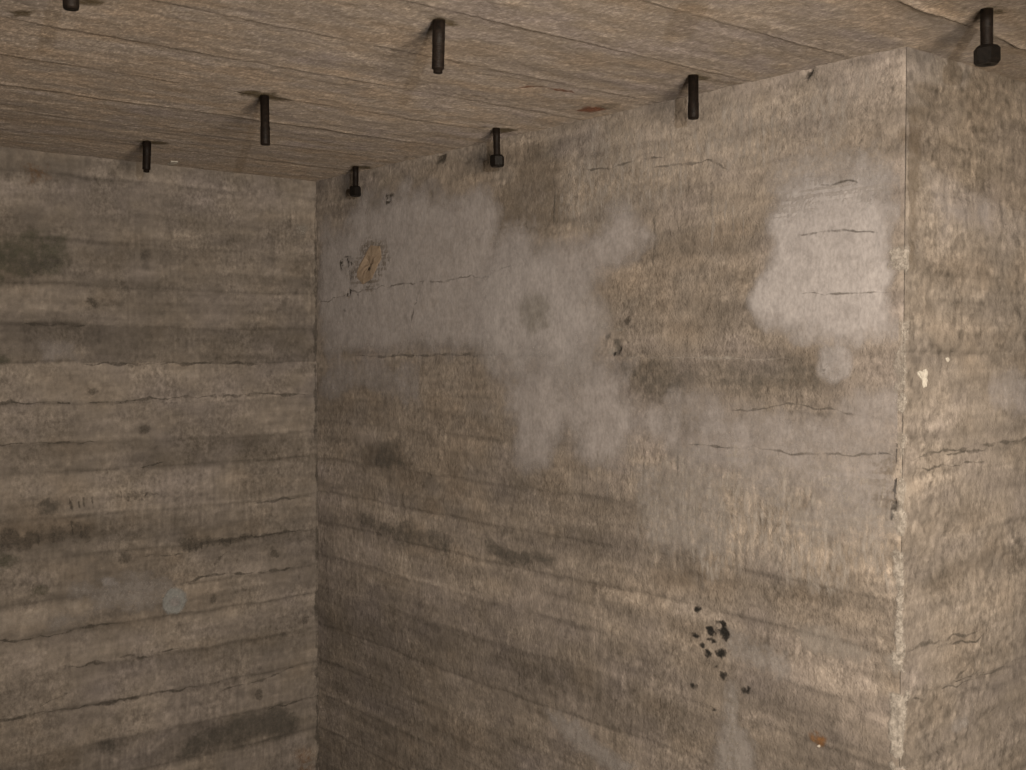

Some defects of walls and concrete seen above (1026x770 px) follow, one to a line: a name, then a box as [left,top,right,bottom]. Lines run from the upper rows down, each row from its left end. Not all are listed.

leakage [320,106,900,594]